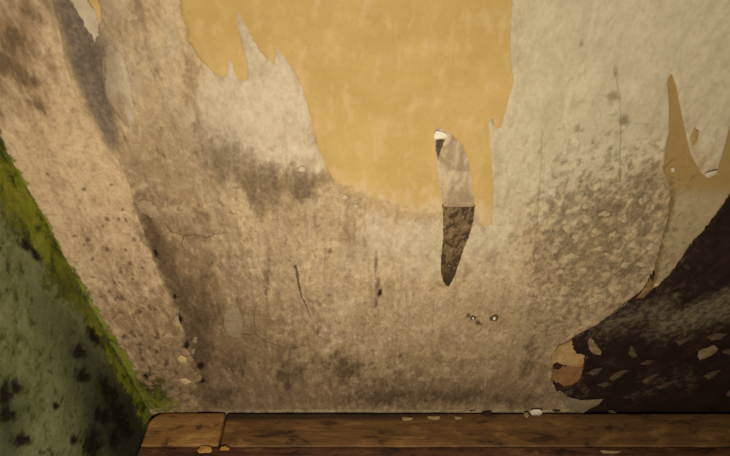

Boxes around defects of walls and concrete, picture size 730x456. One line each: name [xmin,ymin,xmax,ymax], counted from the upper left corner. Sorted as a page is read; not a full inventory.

peeling [180,0,514,286]
water stain [213,152,316,199]
peeling [0,0,202,418]
mould [23,240,40,261]
peeling [550,74,730,414]
crack [294,265,310,317]
mould [0,380,22,422]
mould [14,434,30,447]
mould [71,378,133,456]